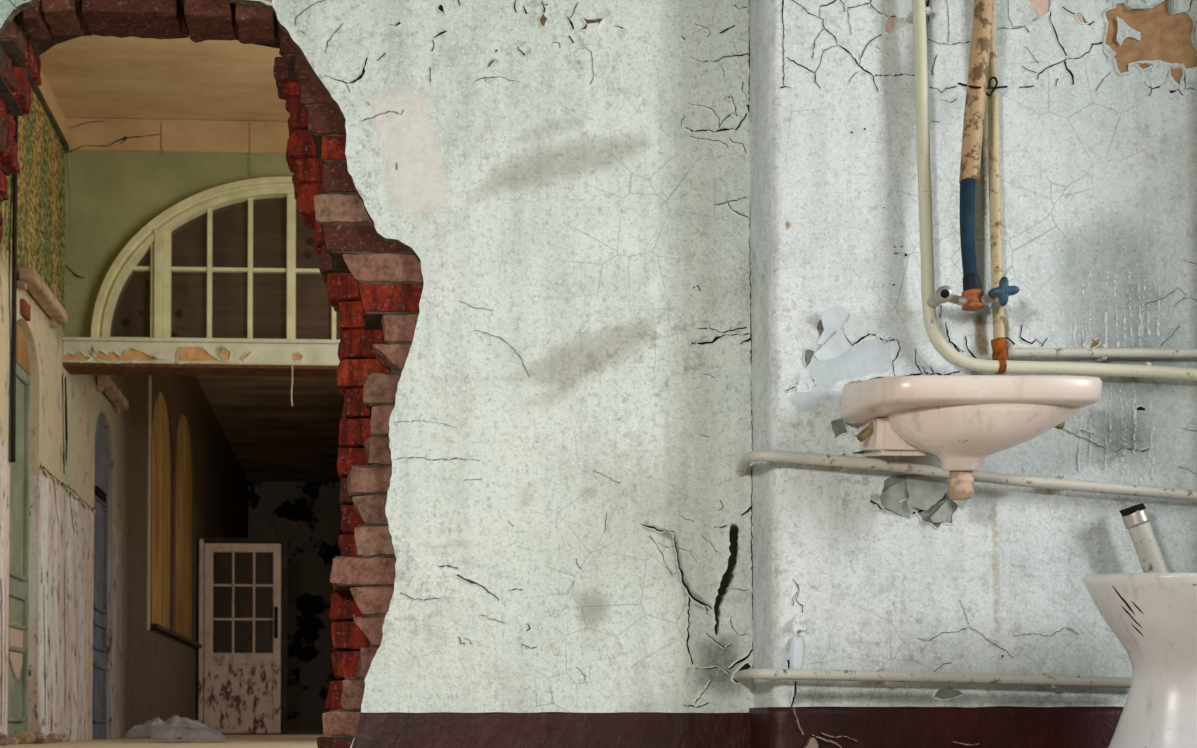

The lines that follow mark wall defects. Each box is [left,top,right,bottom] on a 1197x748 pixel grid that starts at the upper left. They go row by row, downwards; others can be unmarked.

crack [512,0,594,84]
crack [679,4,750,154]
crack [780,0,970,124]
crack [997,2,1111,92]
peeling [1074,0,1197,89]
peeling [784,307,852,393]
crack [840,305,976,380]
crack [1006,325,1048,347]
peeling [62,344,254,477]
crack [640,196,753,709]
peeling [8,618,24,682]
crack [400,564,537,649]